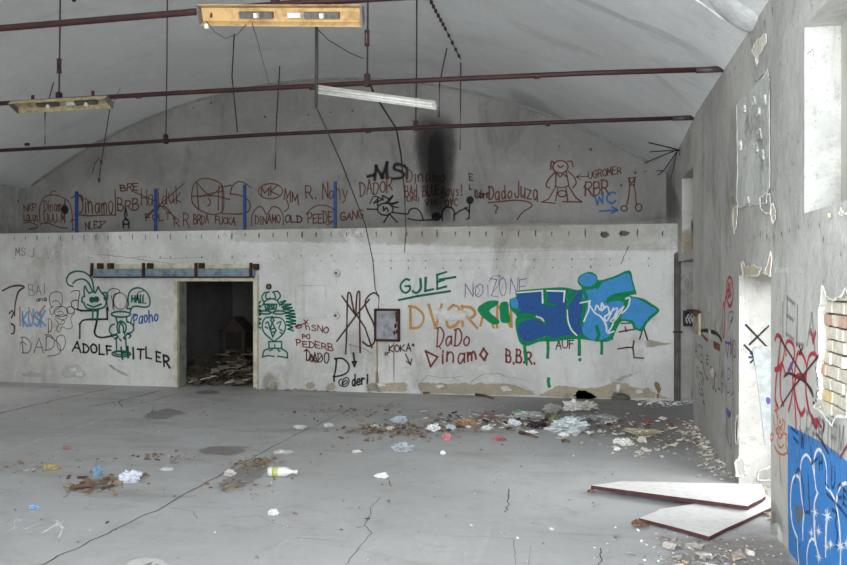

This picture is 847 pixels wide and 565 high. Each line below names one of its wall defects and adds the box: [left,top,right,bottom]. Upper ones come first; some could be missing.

peeling [751,33,767,66]
peeling [733,69,776,234]
flaking render [741,251,772,277]
flaking render [365,372,673,400]
flaking render [813,285,847,427]
crack [42,411,346,565]